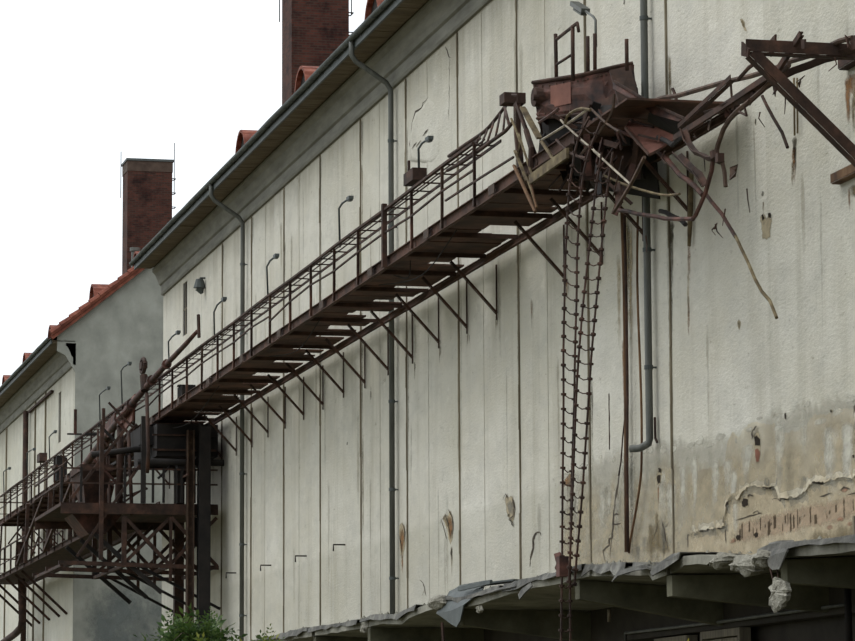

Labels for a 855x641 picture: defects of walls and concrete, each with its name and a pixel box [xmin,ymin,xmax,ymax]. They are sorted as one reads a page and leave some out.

rust [845,75,855,122]
spalling [564,397,855,567]
peeling [503,493,515,526]
crack [530,532,541,564]
damp [644,516,668,551]